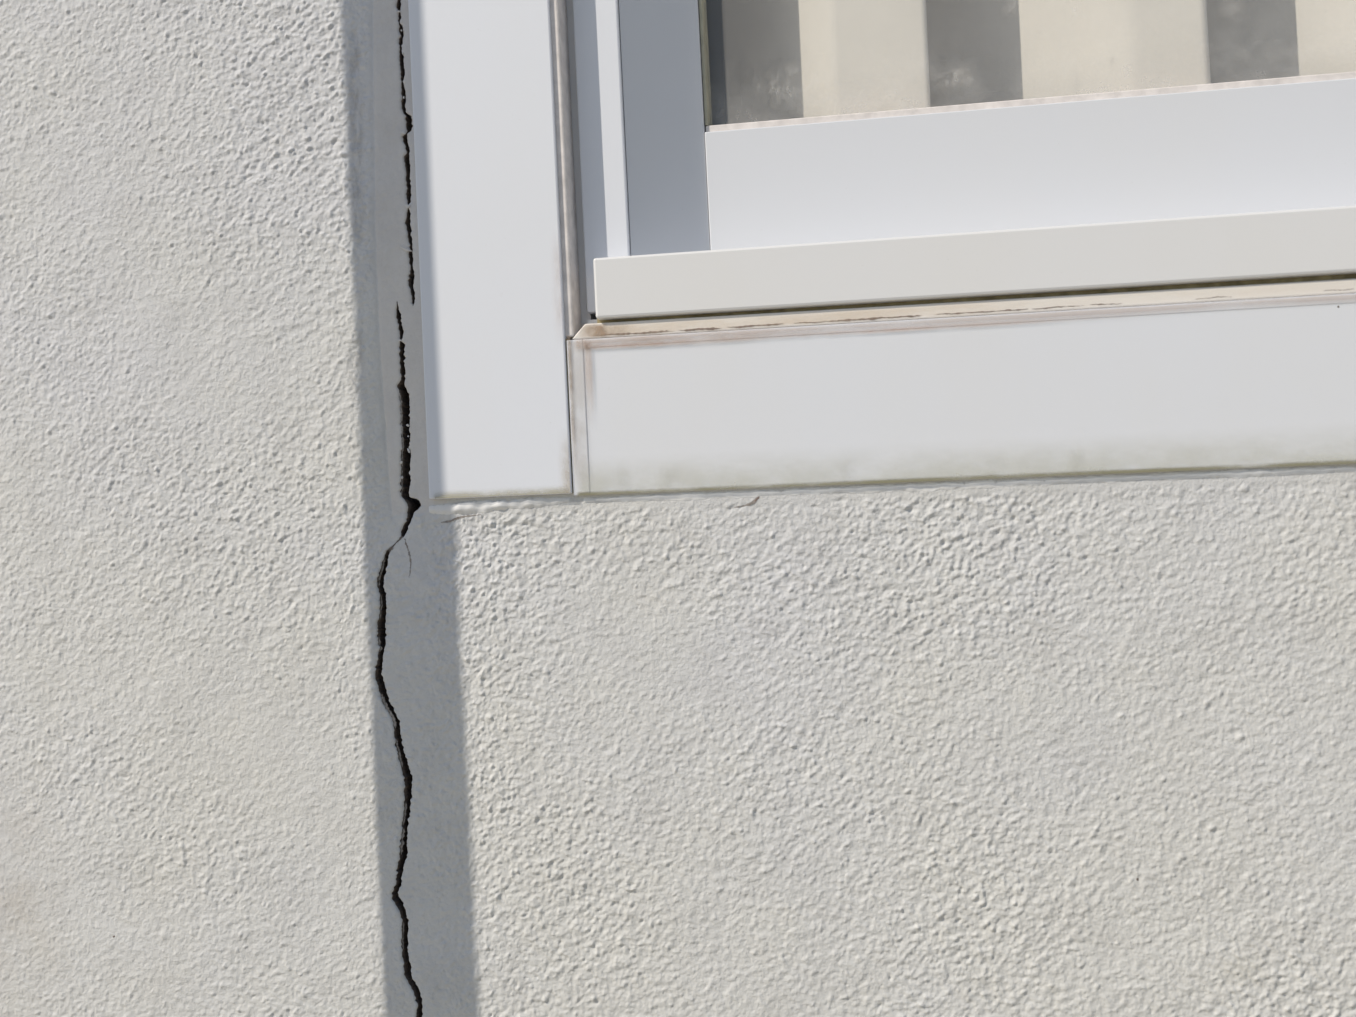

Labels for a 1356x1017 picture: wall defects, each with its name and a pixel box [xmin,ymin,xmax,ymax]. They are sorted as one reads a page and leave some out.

crack [375,0,423,1017]